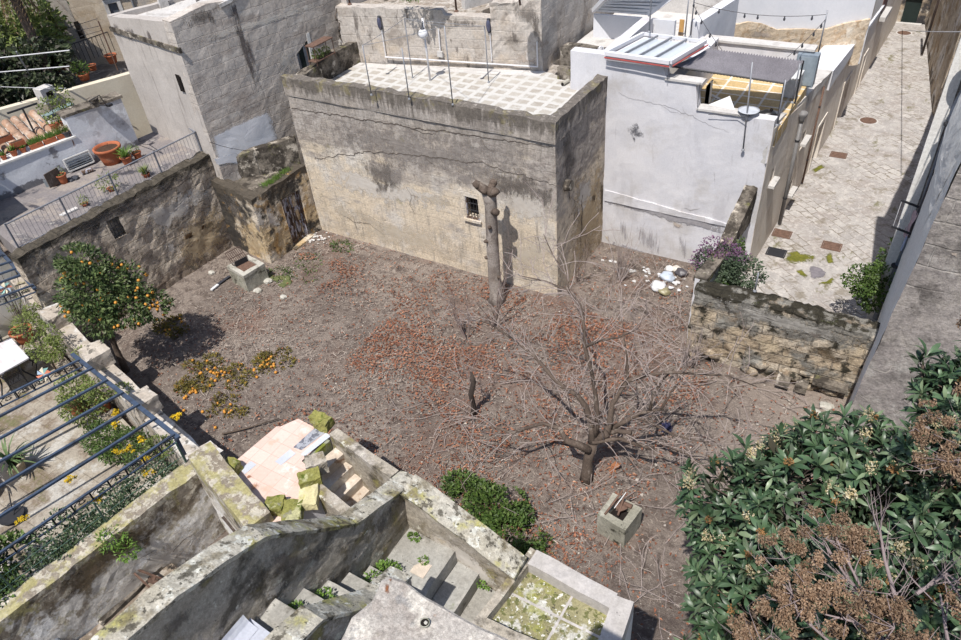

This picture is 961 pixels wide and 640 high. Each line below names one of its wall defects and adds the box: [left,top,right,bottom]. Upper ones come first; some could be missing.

crack [283,106,551,182]
water stain [326,125,523,192]
water stain [563,134,575,178]
water stain [30,493,187,625]